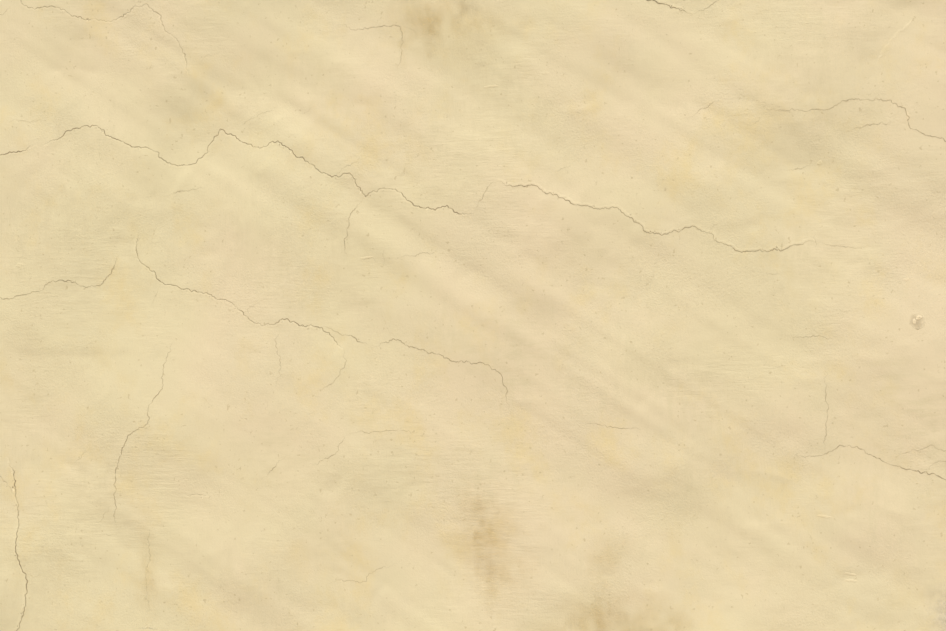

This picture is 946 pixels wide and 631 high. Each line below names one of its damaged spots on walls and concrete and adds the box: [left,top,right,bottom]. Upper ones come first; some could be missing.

crack [647,0,695,15]
crack [0,125,476,217]
crack [497,178,815,252]
crack [133,232,344,351]
crack [6,458,28,631]